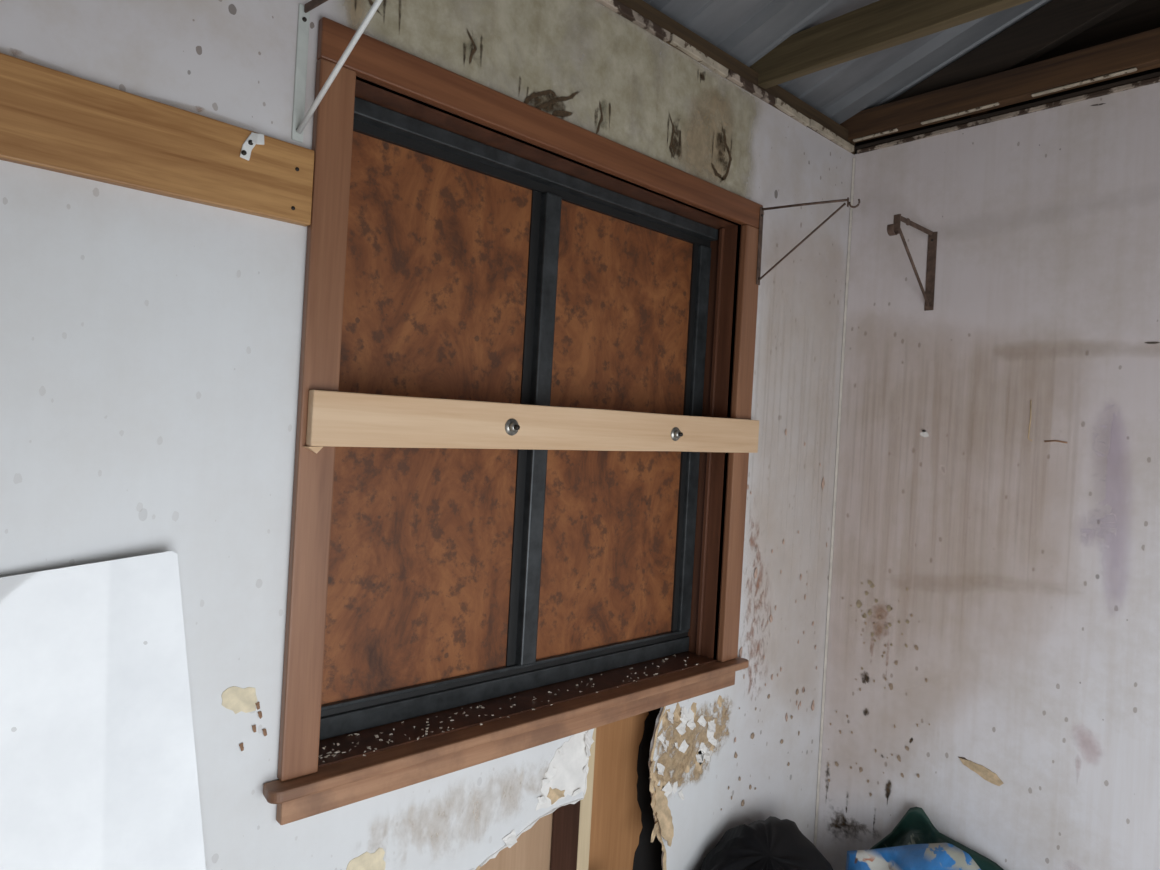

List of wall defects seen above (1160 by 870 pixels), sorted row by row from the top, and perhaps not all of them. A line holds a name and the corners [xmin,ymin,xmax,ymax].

damp [344,0,756,198]
spalling [346,848,386,870]
peeling [472,730,594,870]
peeling [649,695,740,870]